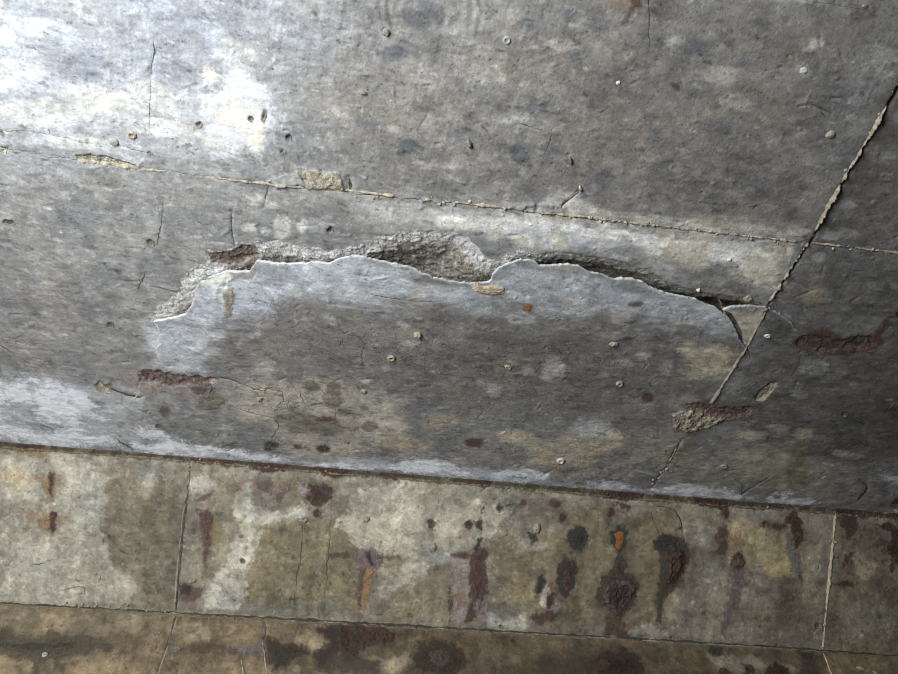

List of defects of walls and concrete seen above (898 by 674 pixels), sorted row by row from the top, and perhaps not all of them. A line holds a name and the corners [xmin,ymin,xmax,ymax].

spalling [151,230,797,411]
rust [127,366,215,399]
water stain [0,377,566,486]
water stain [464,507,484,551]
water stain [559,514,589,552]
rust [604,490,639,517]
water stain [587,480,755,500]
rust [448,548,488,623]
rust [530,557,578,626]
rust [586,526,644,674]
rust [653,534,690,624]
water stain [0,626,114,674]